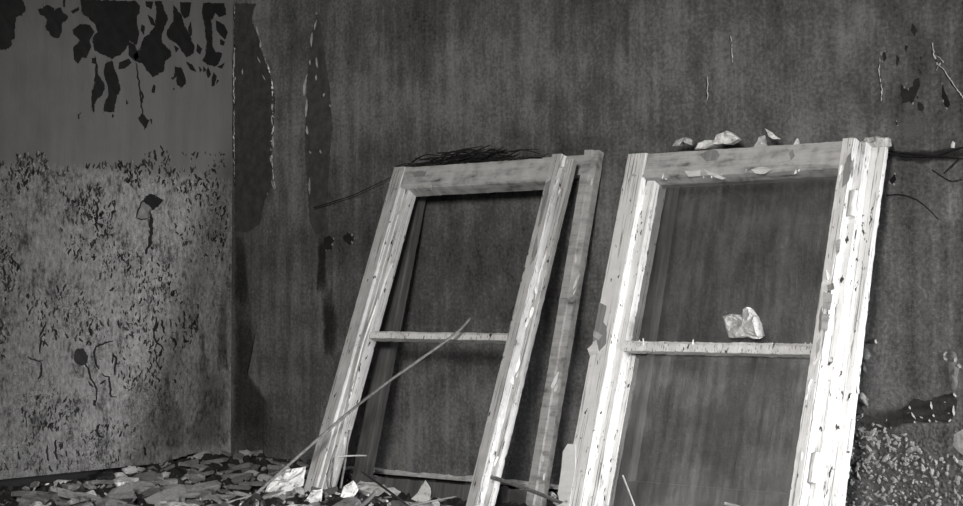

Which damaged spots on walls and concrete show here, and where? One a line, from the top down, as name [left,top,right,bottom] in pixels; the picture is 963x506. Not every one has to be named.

spalling [900,56,924,111]
spalling [941,83,950,109]
spalling [0,0,276,393]
spalling [373,467,473,482]
spalling [841,392,963,506]